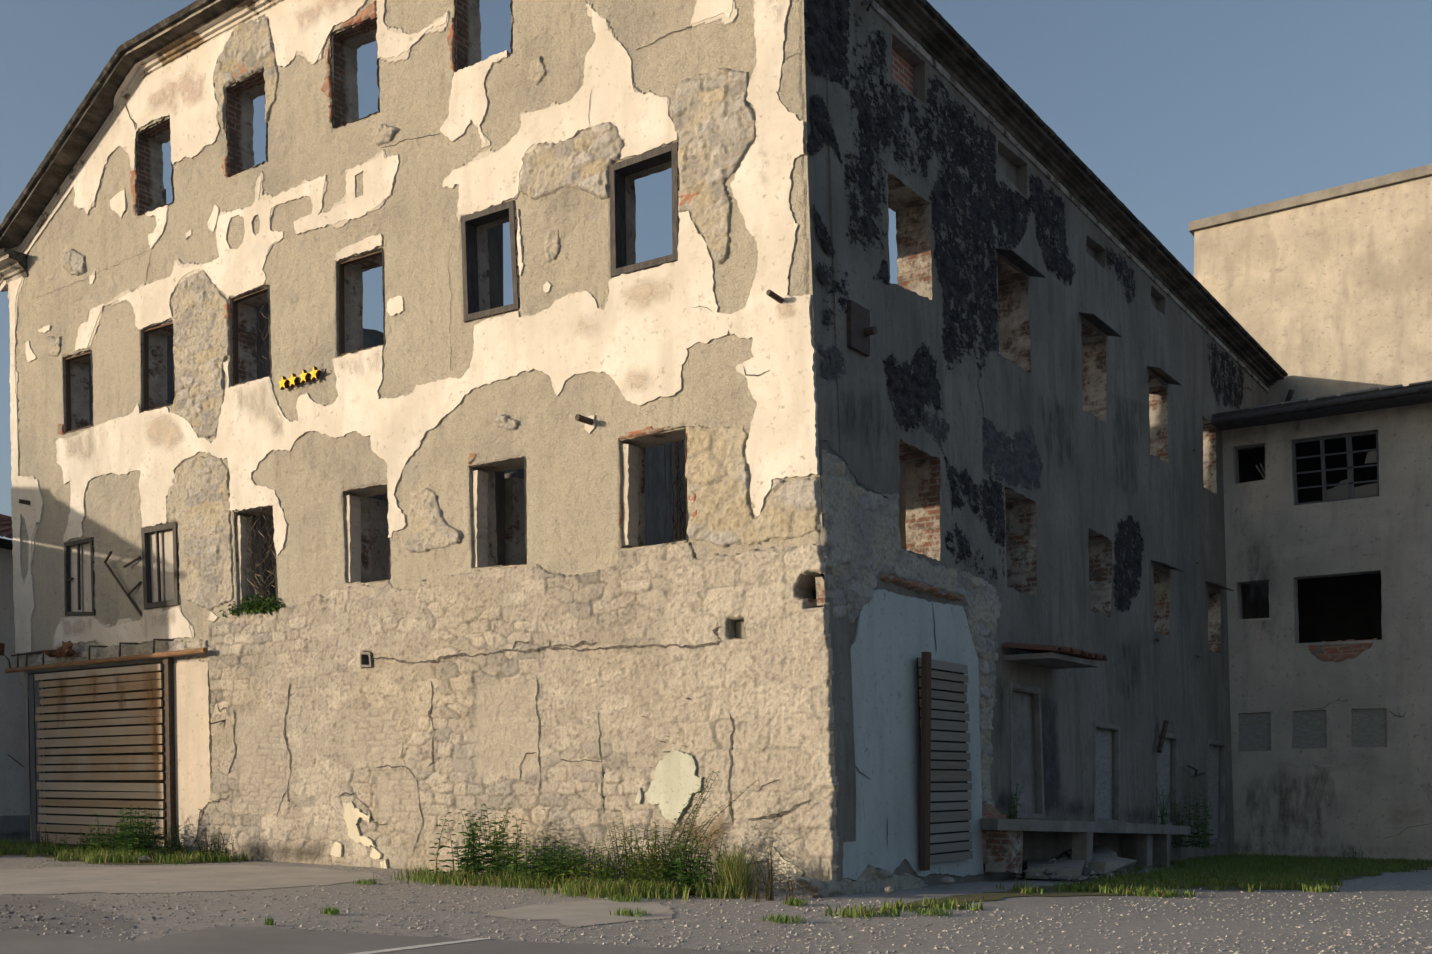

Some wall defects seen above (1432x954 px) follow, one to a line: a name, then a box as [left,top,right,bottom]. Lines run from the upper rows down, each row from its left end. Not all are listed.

spalling [8,0,1076,898]
crack [277,684,292,814]
crack [340,626,722,853]
flaking render [1309,638,1377,662]